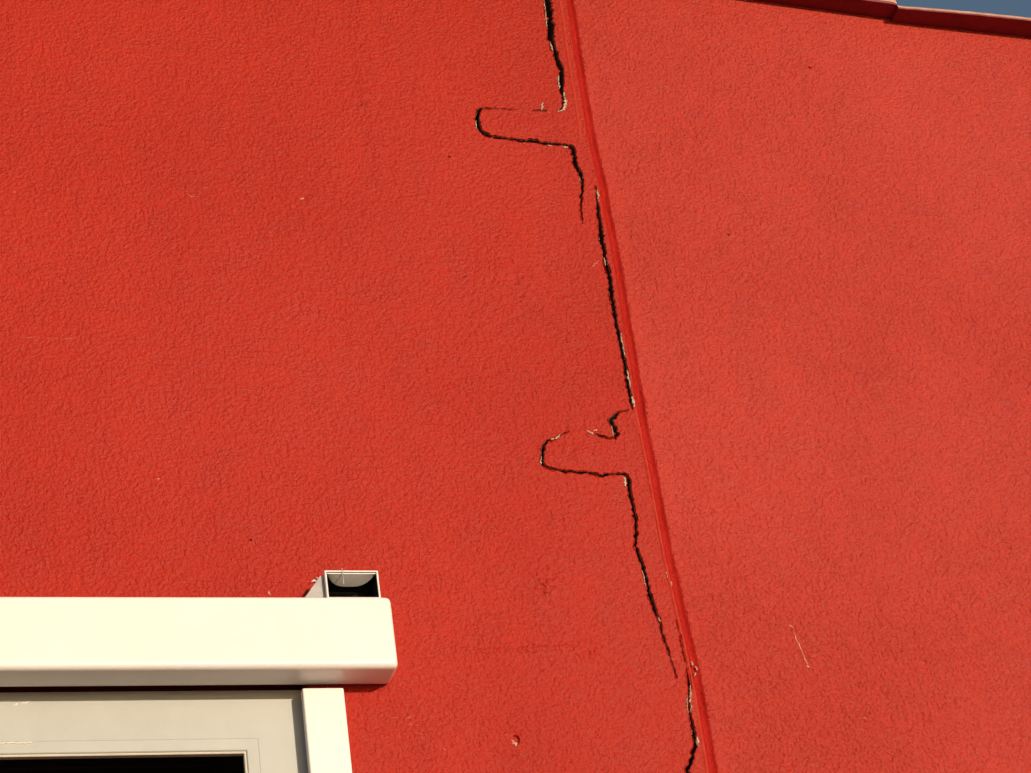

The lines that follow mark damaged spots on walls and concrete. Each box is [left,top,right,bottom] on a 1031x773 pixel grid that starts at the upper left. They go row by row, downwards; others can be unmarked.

crack [473,0,700,773]